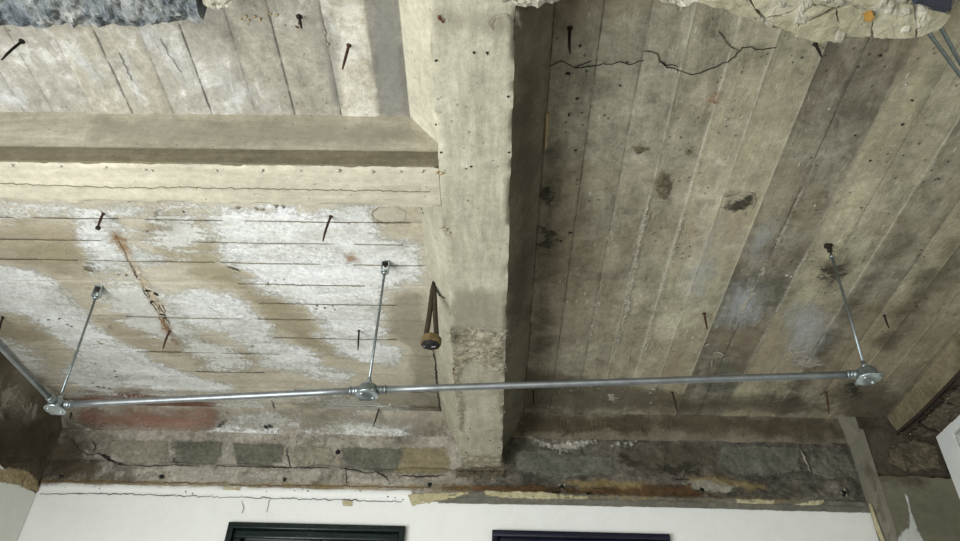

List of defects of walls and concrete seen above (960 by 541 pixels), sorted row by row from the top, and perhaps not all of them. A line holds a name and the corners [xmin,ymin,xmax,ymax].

spalling [0,0,236,29]
spalling [501,0,559,8]
spalling [649,0,960,43]
crack [551,32,776,75]
damp [725,192,756,212]
damp [146,224,330,351]
crack [42,400,402,512]